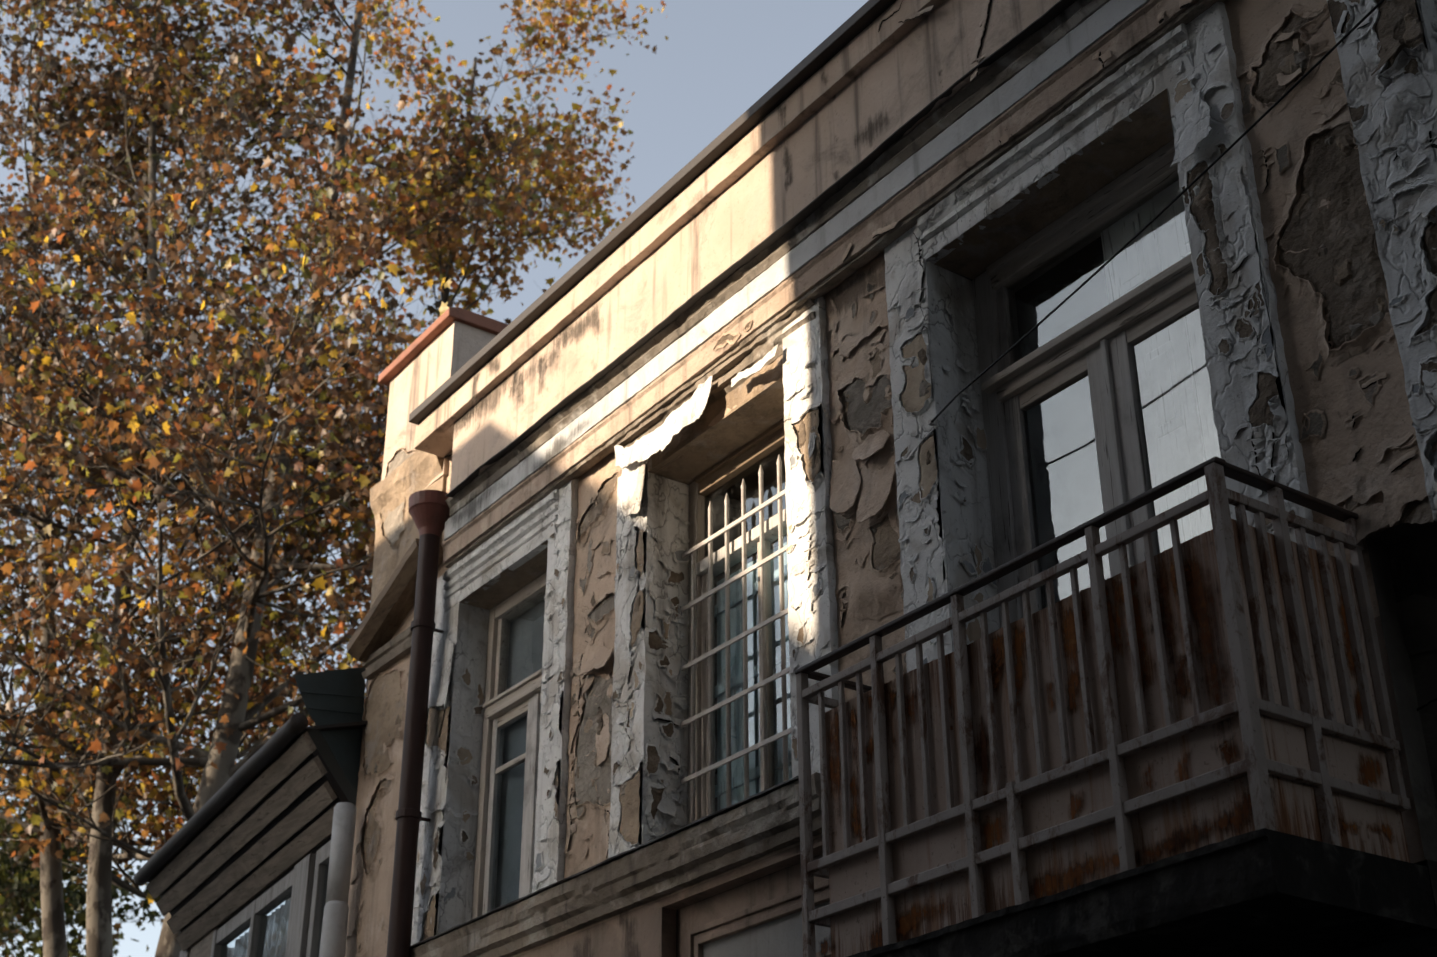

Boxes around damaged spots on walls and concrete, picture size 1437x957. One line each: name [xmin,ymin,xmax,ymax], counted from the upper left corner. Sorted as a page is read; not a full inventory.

flaking render [1170,0,1437,550]
peeling [731,344,779,387]
flaking render [784,255,946,675]
peeling [422,637,485,787]
flaking render [540,376,713,860]
corrosion [975,716,991,796]
corrosion [990,626,1027,722]
corrosion [1046,601,1086,713]
corrosion [1105,552,1238,766]
corrosion [1339,596,1363,719]
peeling [413,801,478,942]
corrosion [1029,788,1253,899]